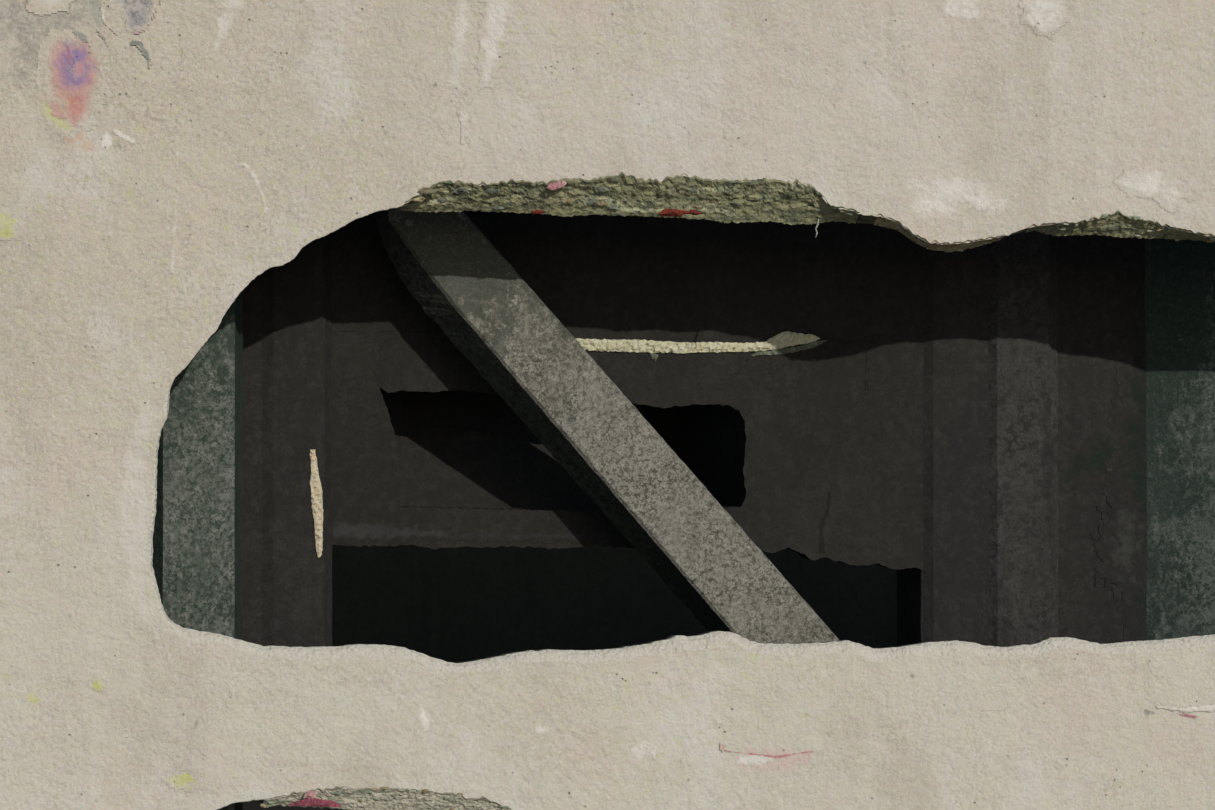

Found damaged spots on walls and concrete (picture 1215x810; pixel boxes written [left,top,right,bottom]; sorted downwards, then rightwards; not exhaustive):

spalling [400,172,860,225]
spalling [874,213,1004,252]
spalling [1026,210,1215,243]
spalling [575,331,827,361]
spalling [310,449,323,558]
spalling [260,786,512,810]